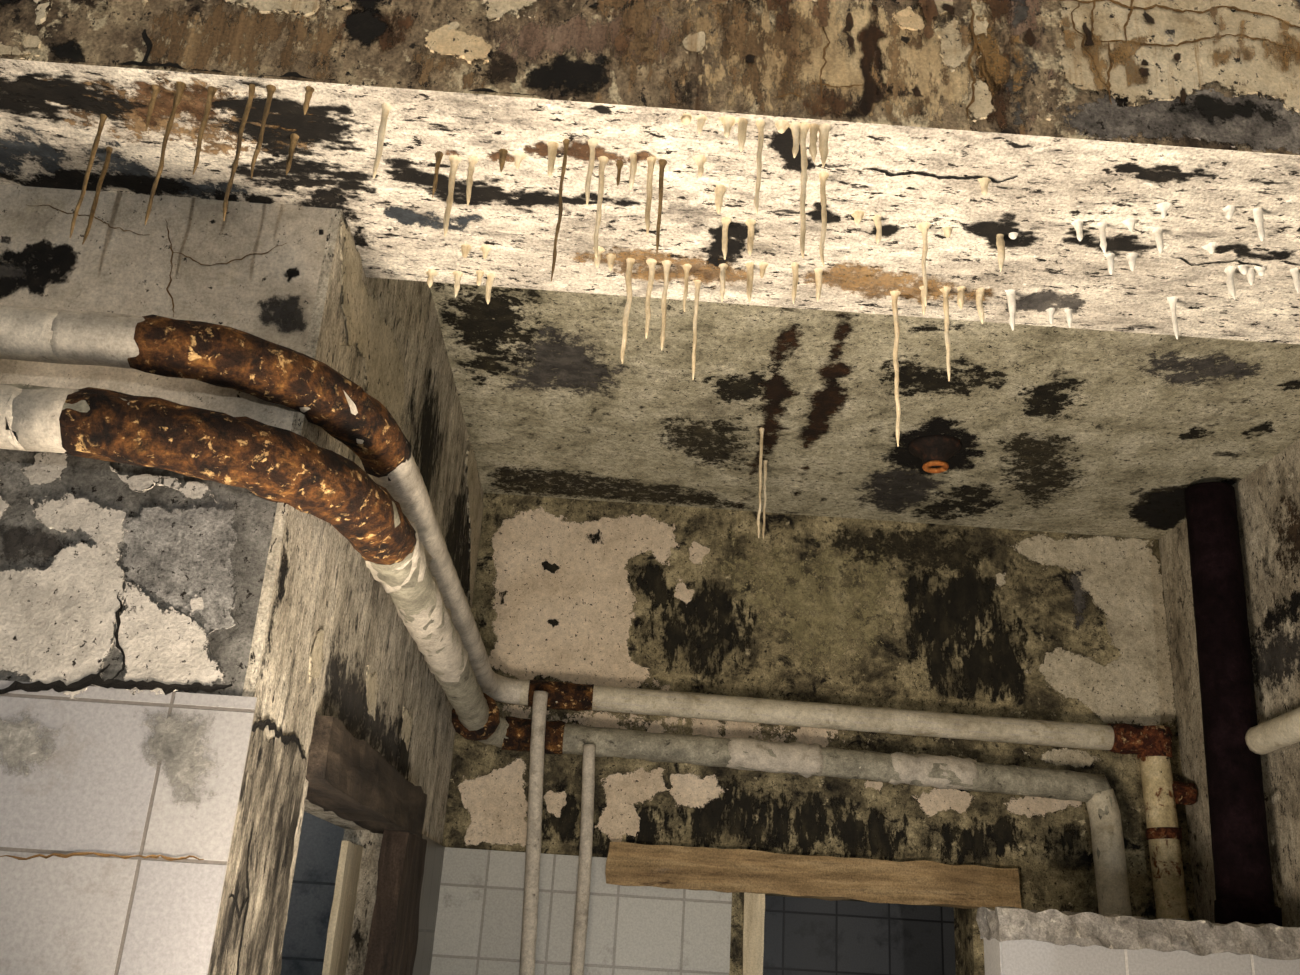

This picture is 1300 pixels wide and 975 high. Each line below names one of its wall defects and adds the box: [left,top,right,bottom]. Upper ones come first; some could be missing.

damp [0,2,641,250]
flaking render [1037,0,1300,154]
crack [1061,0,1300,104]
damp [963,214,1157,258]
damp [488,313,857,509]
crack [0,592,233,695]
flaking render [0,452,238,699]
crack [251,719,306,760]
peeling [465,433,710,691]
peeling [497,701,854,842]
damp [628,355,1089,707]
peeling [1007,478,1241,727]